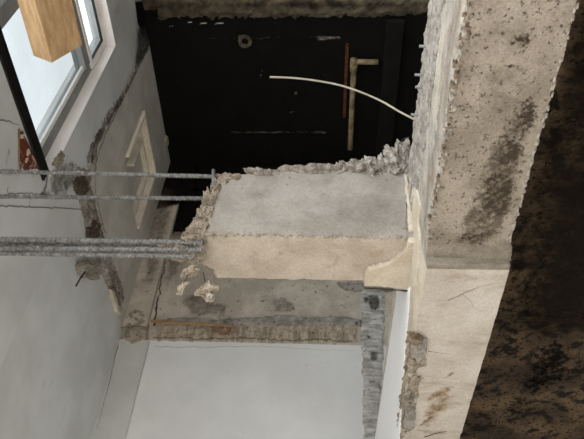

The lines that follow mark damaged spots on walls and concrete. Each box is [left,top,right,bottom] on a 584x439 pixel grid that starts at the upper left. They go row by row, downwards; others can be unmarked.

spalling [52,150,65,169]
spalling [72,49,148,239]
spalling [151,0,446,292]
spalling [426,0,472,242]
leakage [482,139,523,217]
spalling [93,251,124,316]
crack [153,261,167,326]
spalling [120,309,362,344]
spalling [397,331,428,439]